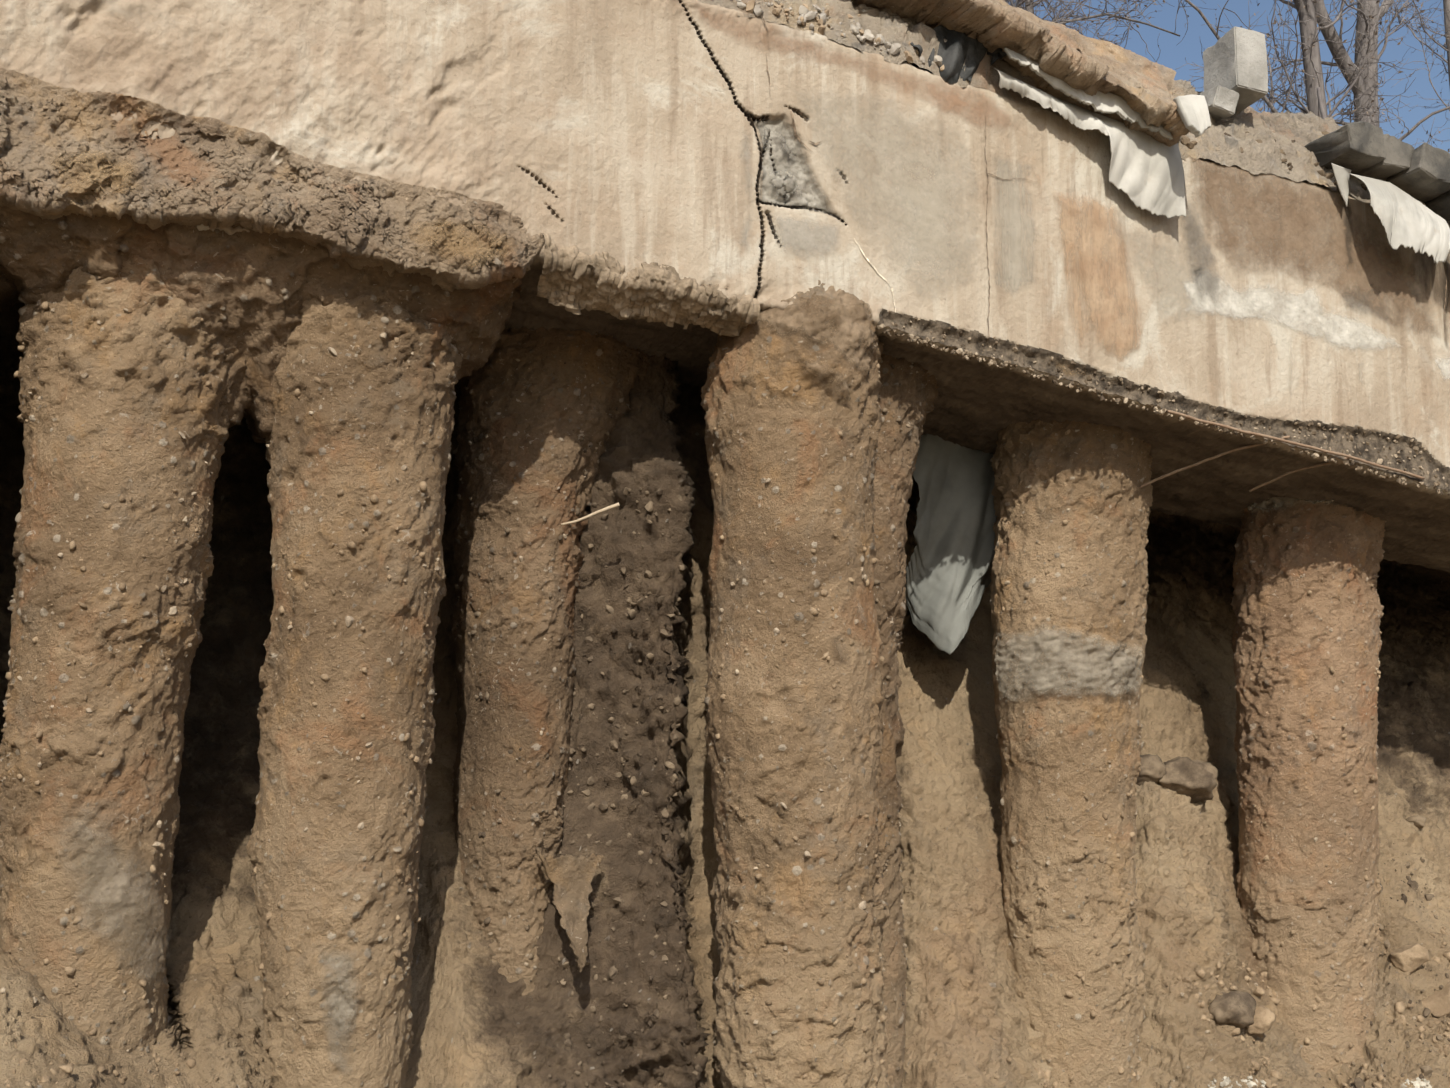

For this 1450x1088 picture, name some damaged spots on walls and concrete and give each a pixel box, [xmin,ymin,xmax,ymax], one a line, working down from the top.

crack [679,0,896,312]
spalling [758,119,828,213]
spalling [536,233,1450,495]
damp [1414,250,1450,310]